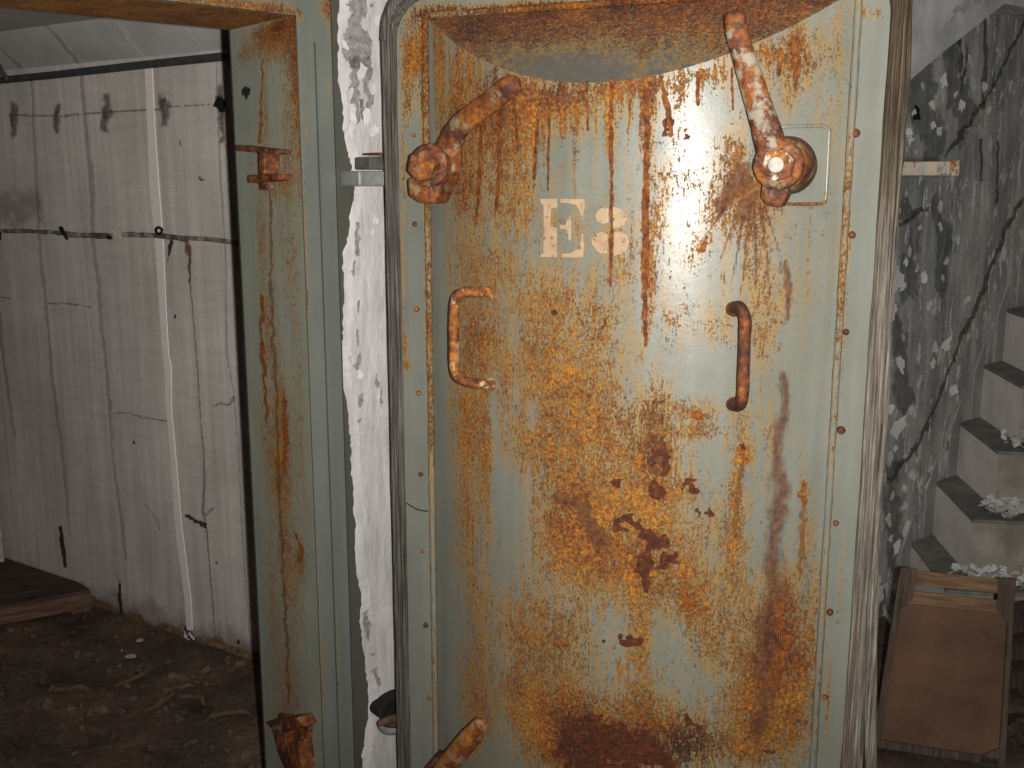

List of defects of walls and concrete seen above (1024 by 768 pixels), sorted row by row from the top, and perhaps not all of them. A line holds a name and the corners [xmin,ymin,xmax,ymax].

peeling [337,0,390,171]
rust [532,87,551,191]
rust [640,77,690,347]
rust [696,235,709,253]
rust [259,294,270,421]
crack [185,514,207,528]
peeling [342,186,398,768]
rust [612,513,680,593]
rust [647,433,671,500]
rust [681,478,700,494]
rust [618,633,643,647]
rust [552,712,676,768]